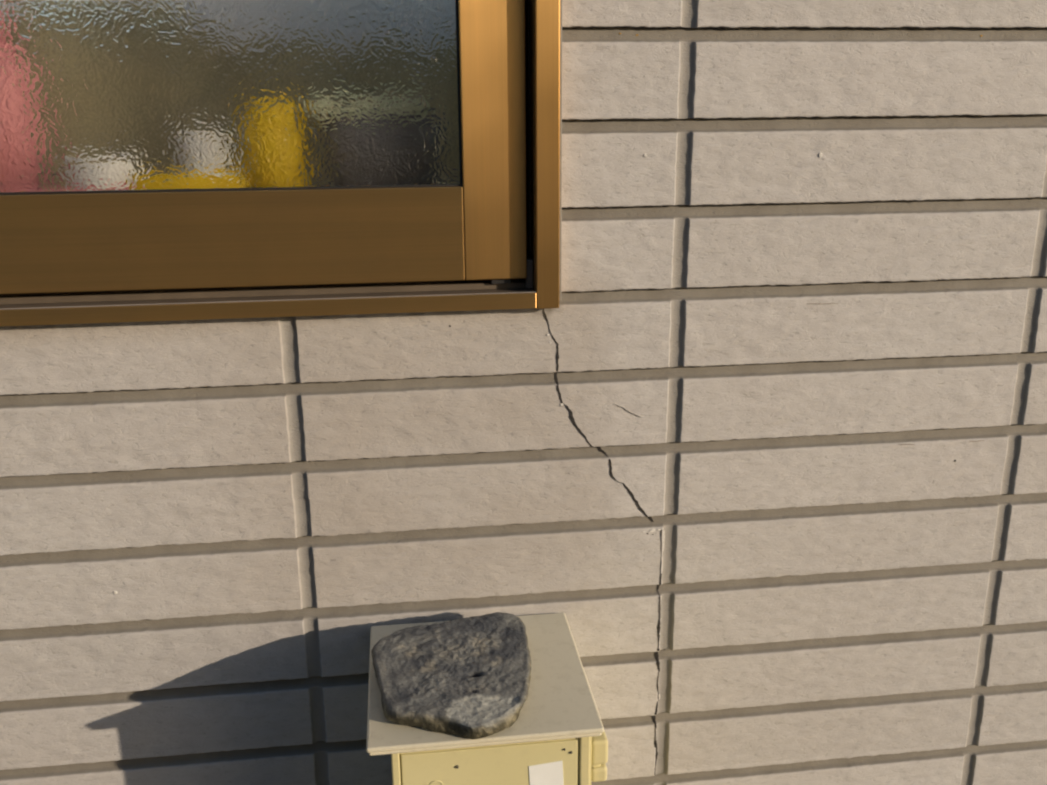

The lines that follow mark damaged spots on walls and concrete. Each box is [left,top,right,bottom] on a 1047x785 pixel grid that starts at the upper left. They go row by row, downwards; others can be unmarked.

crack [543,309,665,775]